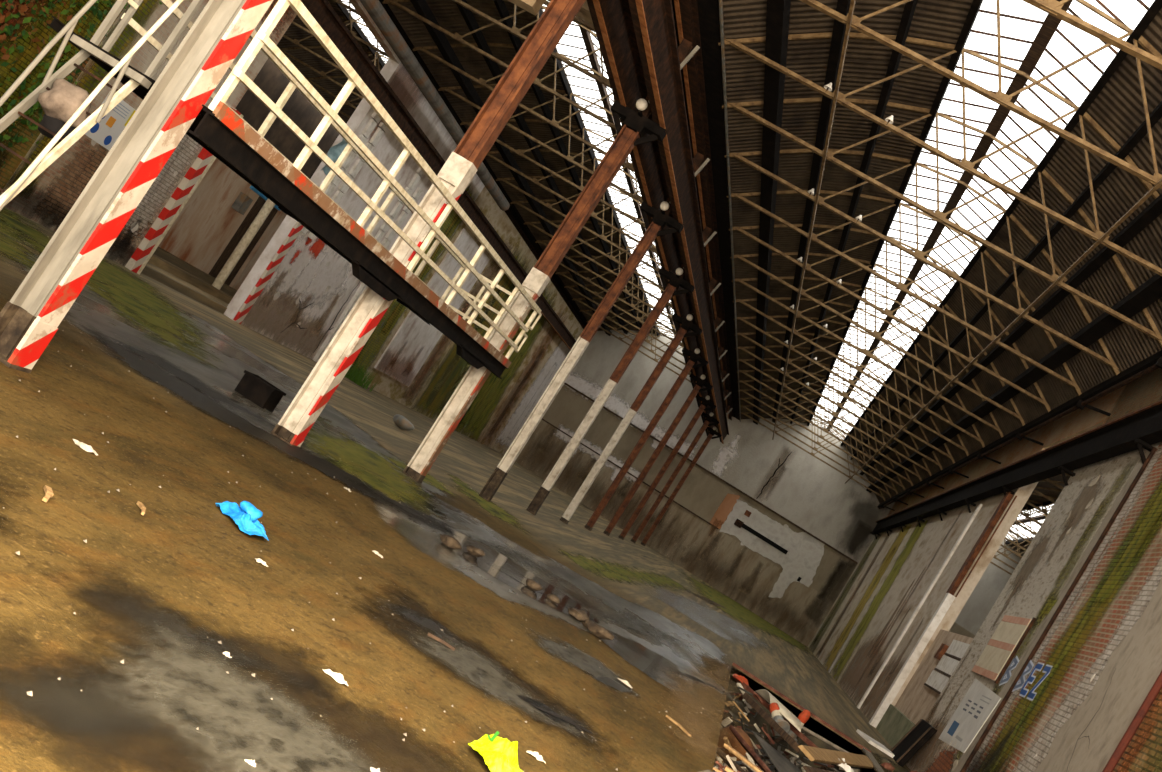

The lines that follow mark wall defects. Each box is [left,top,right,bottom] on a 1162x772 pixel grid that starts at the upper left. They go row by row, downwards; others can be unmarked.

water stain [7,247,41,274]
rust [290,237,326,264]
water stain [65,282,734,699]
peeling [719,500,825,598]
water stain [682,503,880,633]
water stain [828,581,923,721]
water stain [965,448,1162,772]
water stain [907,687,959,772]